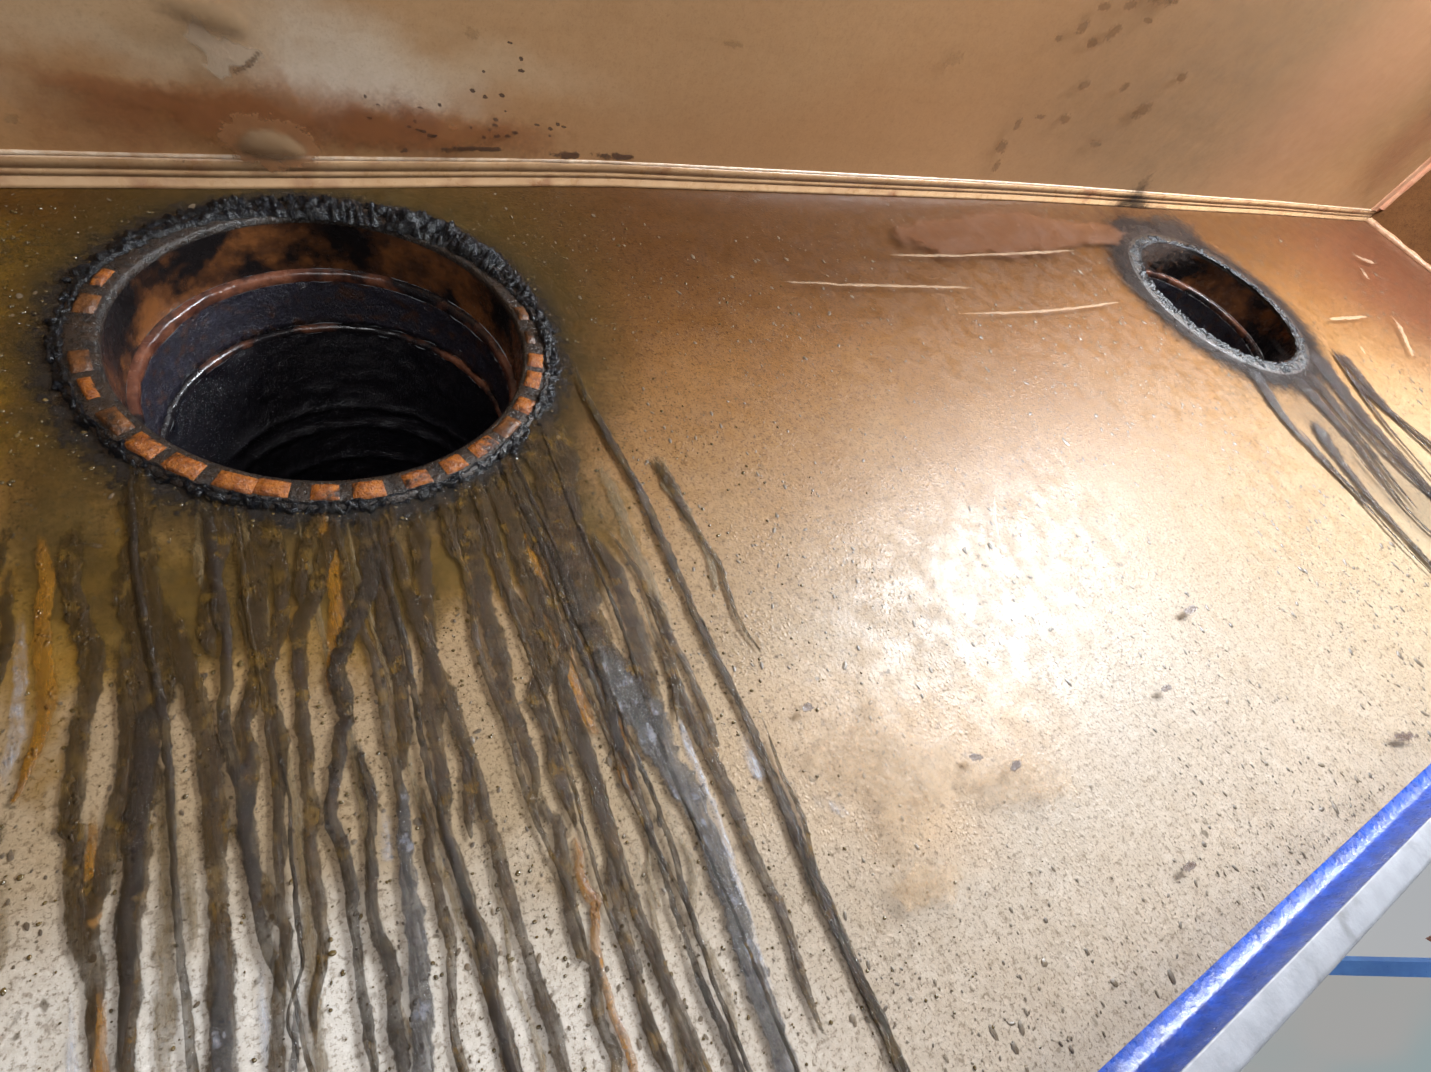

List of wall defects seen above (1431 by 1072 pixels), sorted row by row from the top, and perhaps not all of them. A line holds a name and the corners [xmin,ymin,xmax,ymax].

peeling [187,23,262,78]
corrosion [50,76,531,147]
leakage [1245,345,1431,573]
leakage [0,372,911,1072]